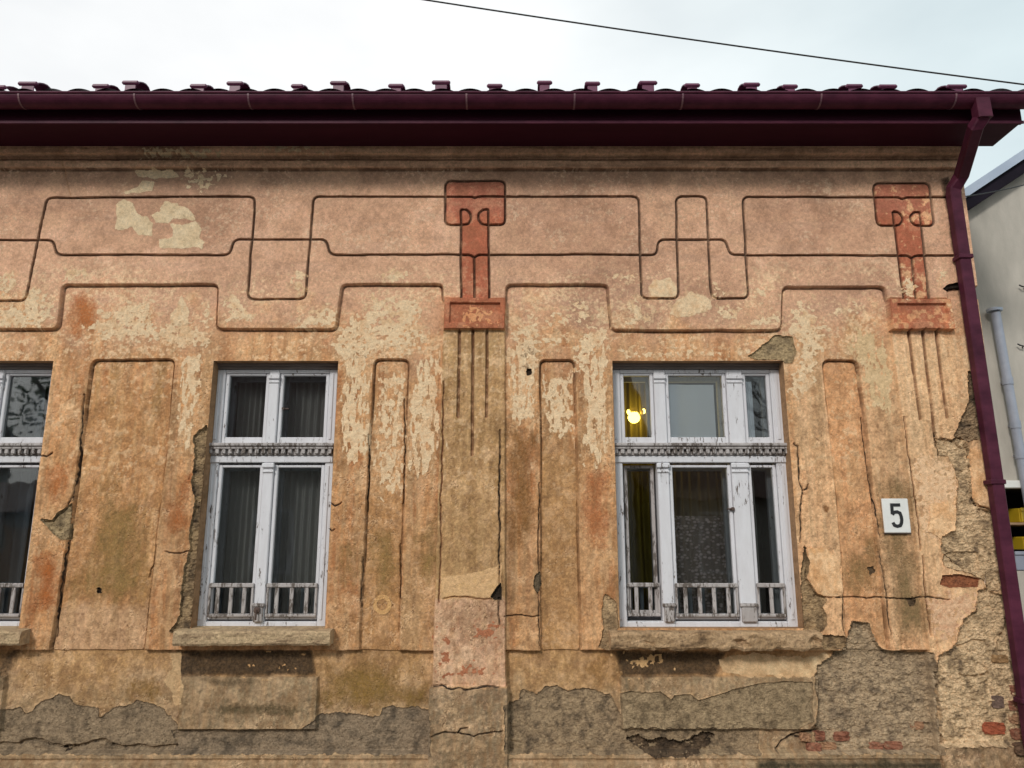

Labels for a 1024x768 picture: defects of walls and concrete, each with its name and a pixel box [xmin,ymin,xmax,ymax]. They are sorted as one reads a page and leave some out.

peeling [115,147,227,249]
peeling [294,268,448,502]
peeling [505,298,832,469]
flaking render [40,503,74,540]
crack [57,540,70,633]
crack [68,395,85,505]
peeling [81,294,256,633]
flaking render [503,371,1024,759]
crack [794,444,808,538]
crack [805,418,945,633]
flaking render [0,651,431,756]
crack [434,728,502,737]